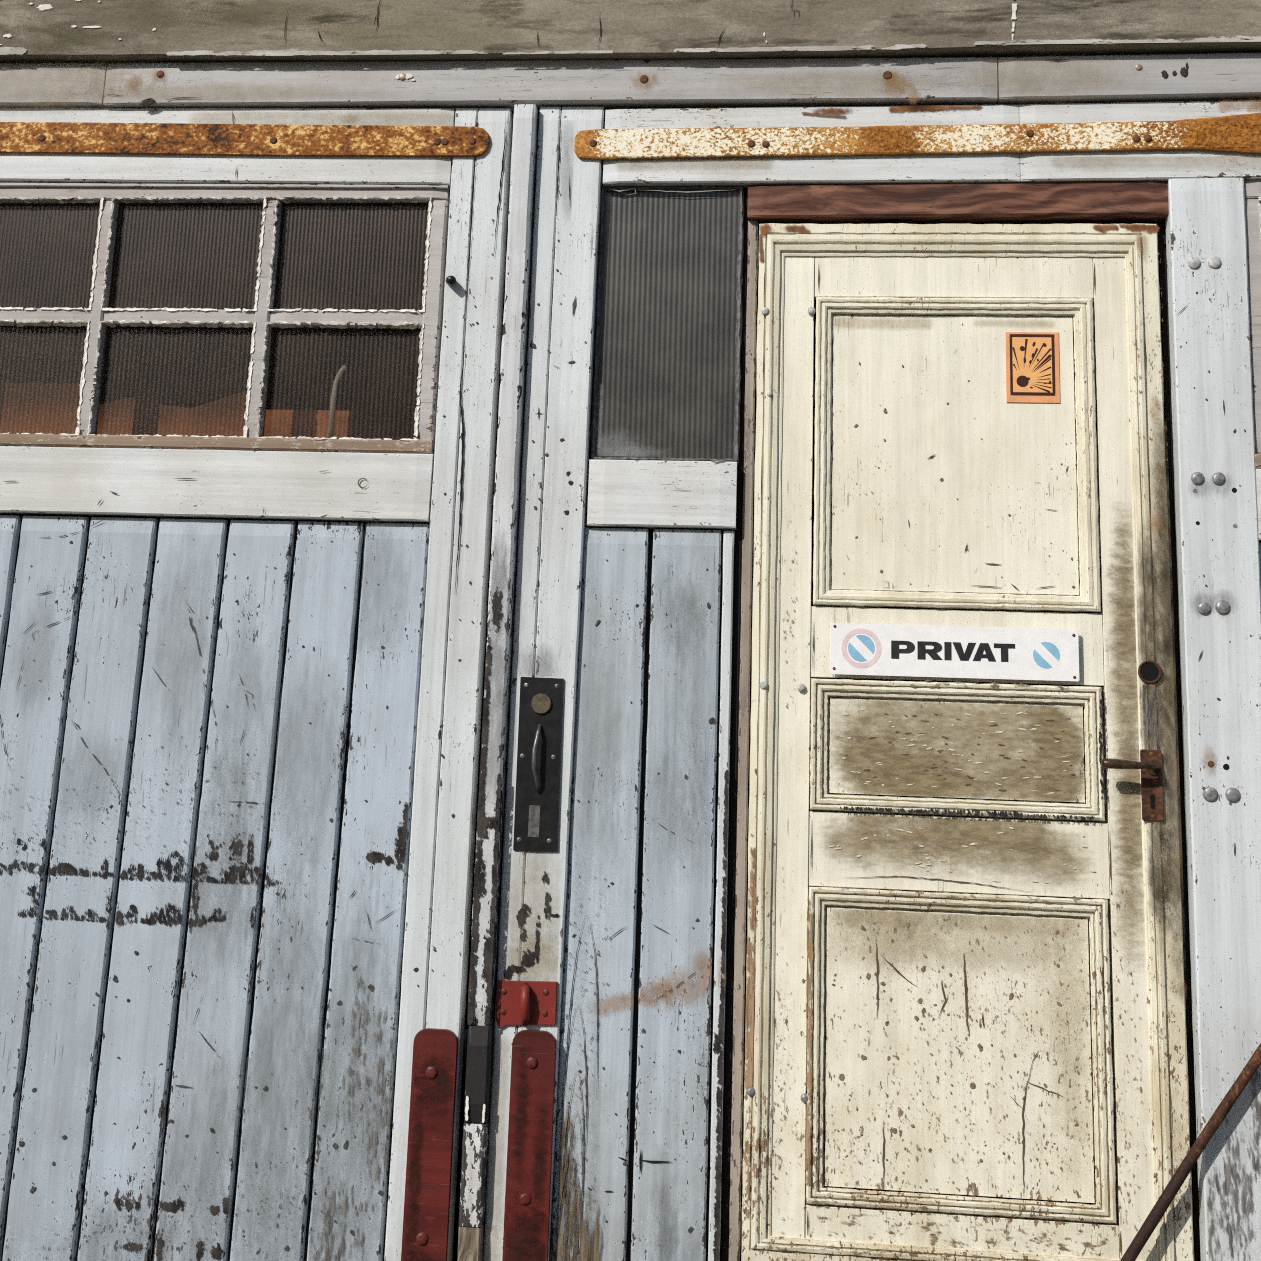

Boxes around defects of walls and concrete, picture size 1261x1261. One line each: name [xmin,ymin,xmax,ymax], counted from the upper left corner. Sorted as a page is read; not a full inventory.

peeling [0,33,27,55]
rust [860,127,921,151]
rust [1183,121,1261,148]
leakage [1113,428,1183,927]
leakage [842,700,1083,801]
peeling [0,749,284,933]